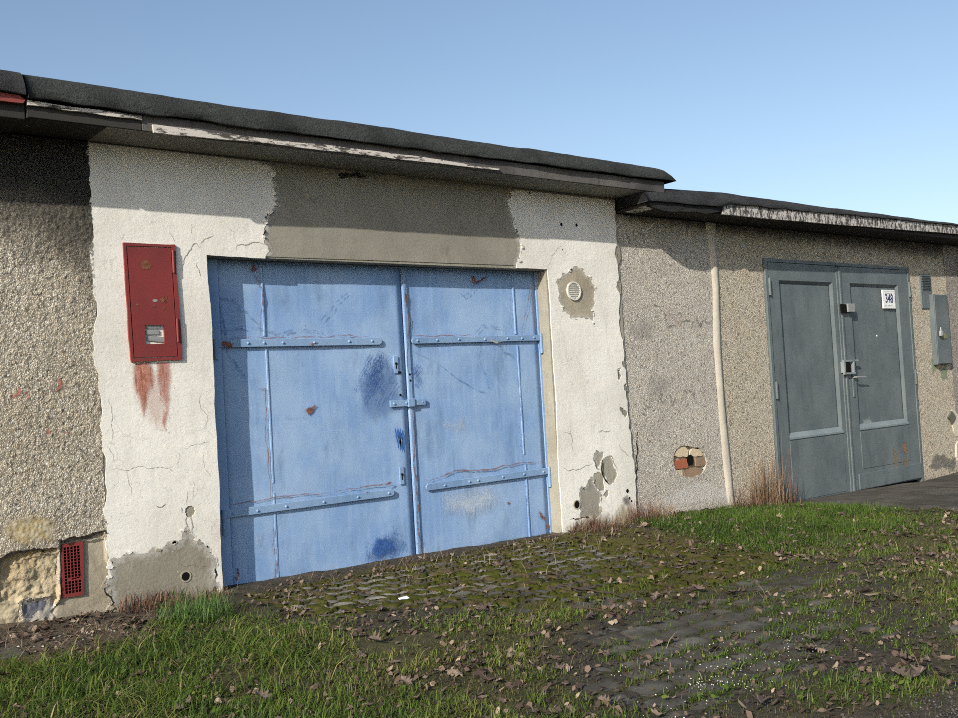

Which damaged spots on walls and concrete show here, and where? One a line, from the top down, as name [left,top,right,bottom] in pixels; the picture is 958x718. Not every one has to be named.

corrosion [136,362,169,424]
crack [108,396,212,529]
spalling [579,450,617,519]
spalling [673,446,706,477]
spalling [0,531,106,624]